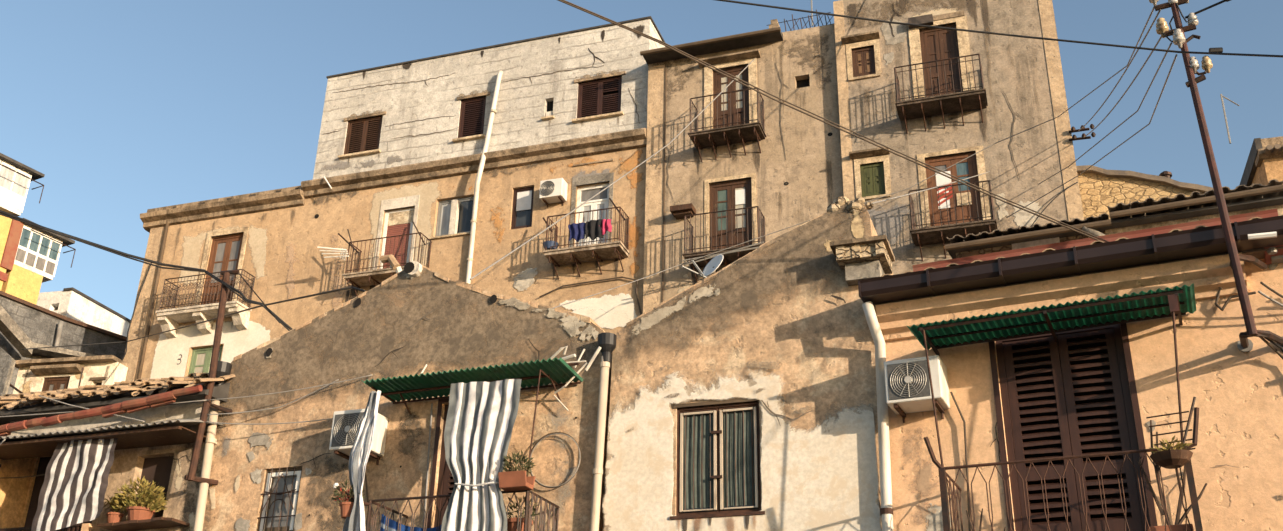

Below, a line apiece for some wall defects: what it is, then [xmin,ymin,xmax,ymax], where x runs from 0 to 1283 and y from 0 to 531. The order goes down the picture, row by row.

crack [1003,91,1024,179]
peeling [490,268,720,341]
peeling [602,361,882,531]